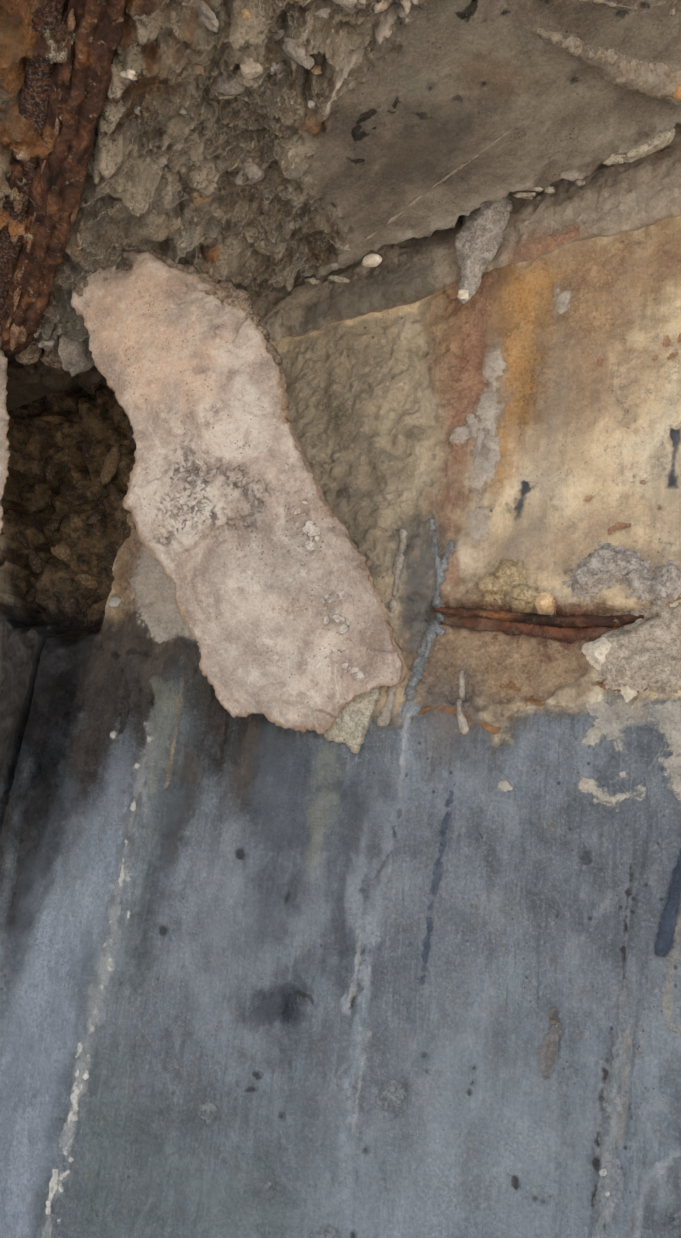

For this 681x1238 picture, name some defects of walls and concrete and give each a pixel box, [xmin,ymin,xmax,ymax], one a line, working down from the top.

spalling [44,30,91,64]
corrosion [0,0,170,355]
spalling [92,0,390,242]
crack [349,98,432,164]
crack [362,136,503,243]
spalling [34,323,94,376]
leakage [0,512,313,1238]
leakage [335,846,381,1041]
leakage [399,523,592,765]
corrosion [433,601,644,647]
peeling [578,776,646,806]
spalling [581,602,681,801]